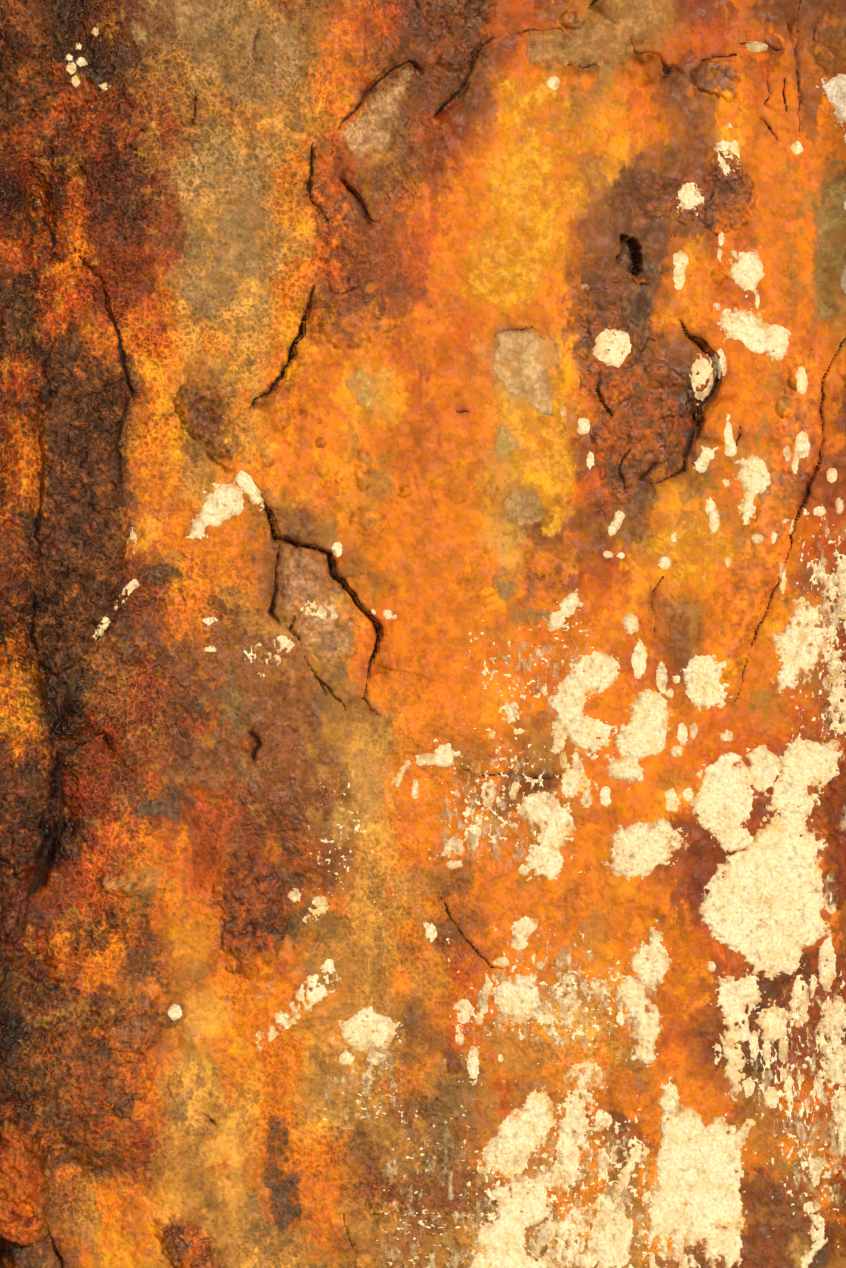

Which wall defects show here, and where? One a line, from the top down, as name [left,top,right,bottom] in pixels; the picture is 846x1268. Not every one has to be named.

corrosion [461,72,583,313]
crack [23,216,135,483]
corrosion [29,324,181,677]
crack [249,284,317,409]
crack [264,504,388,715]
crack [595,319,725,493]
crack [732,339,846,705]
corrosion [0,715,123,1249]
corrosion [232,957,302,1234]
corrosion [671,828,734,1025]
corrosion [823,763,846,909]
corrosion [149,1212,230,1268]